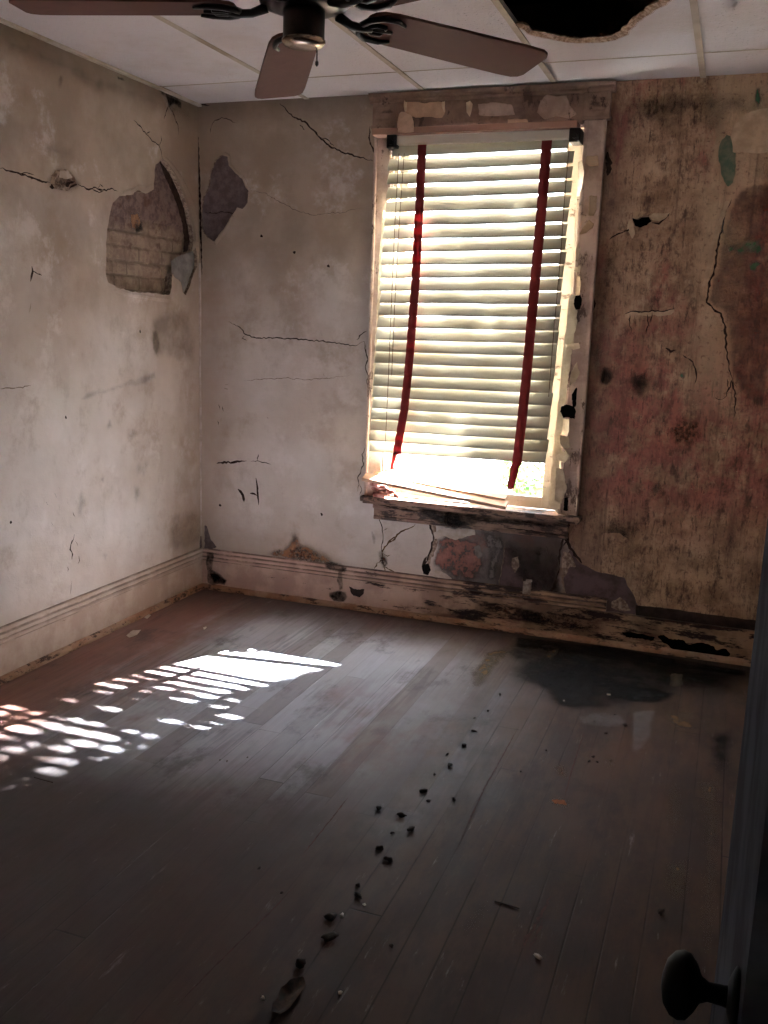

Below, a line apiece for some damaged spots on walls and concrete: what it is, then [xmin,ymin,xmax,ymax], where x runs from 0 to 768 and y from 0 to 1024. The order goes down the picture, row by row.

crack [275,104,374,168]
peeling [397,101,445,133]
crack [78,184,118,193]
spalling [106,152,251,303]
crack [227,322,368,383]
peeling [549,156,599,512]
crack [217,454,269,464]
crack [357,449,438,575]
damp [273,539,346,602]
peeling [431,528,483,579]
damp [512,638,745,708]
peeling [622,632,730,657]